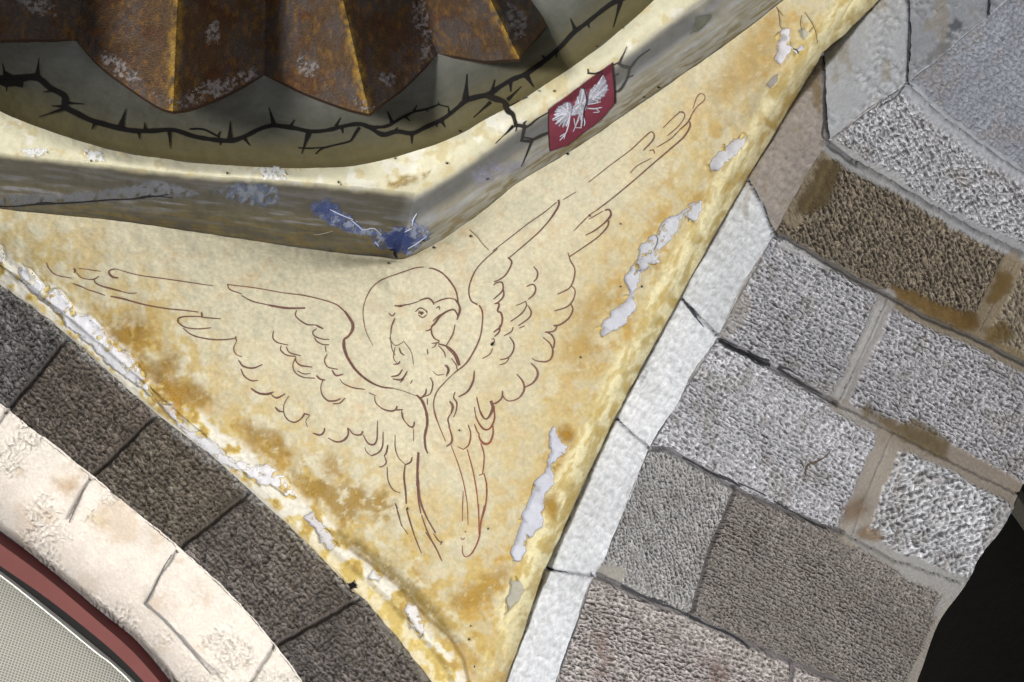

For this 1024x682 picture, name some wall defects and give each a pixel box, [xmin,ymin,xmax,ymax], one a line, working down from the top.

flaking render [768,28,808,88]
flaking render [707,133,746,171]
leakage [798,161,839,213]
flaking render [596,200,702,337]
flaking render [19,267,296,500]
flaking render [510,427,568,561]
flaking render [303,512,337,550]